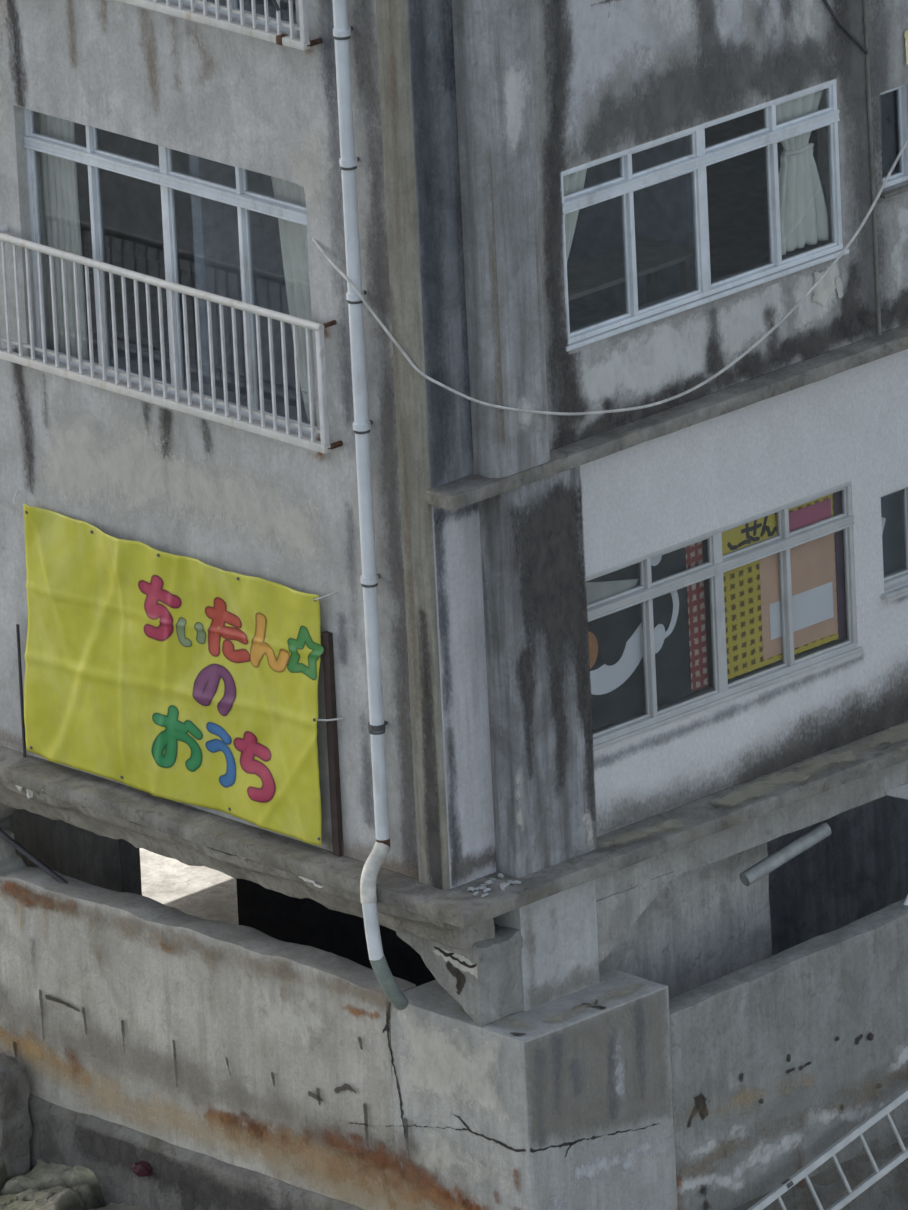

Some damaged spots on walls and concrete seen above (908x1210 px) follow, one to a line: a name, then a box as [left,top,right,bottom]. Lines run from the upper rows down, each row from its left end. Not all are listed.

leakage [7,0,26,107]
leakage [321,0,338,167]
leakage [544,0,908,449]
leakage [355,0,496,889]
leakage [511,485,908,847]
corrosion [2,881,75,912]
corrosion [344,1006,378,1019]
spalling [433,948,478,995]
crack [578,999,606,1009]
corrosion [204,1109,498,1210]
crack [325,1002,659,1161]
spalling [687,1093,709,1127]